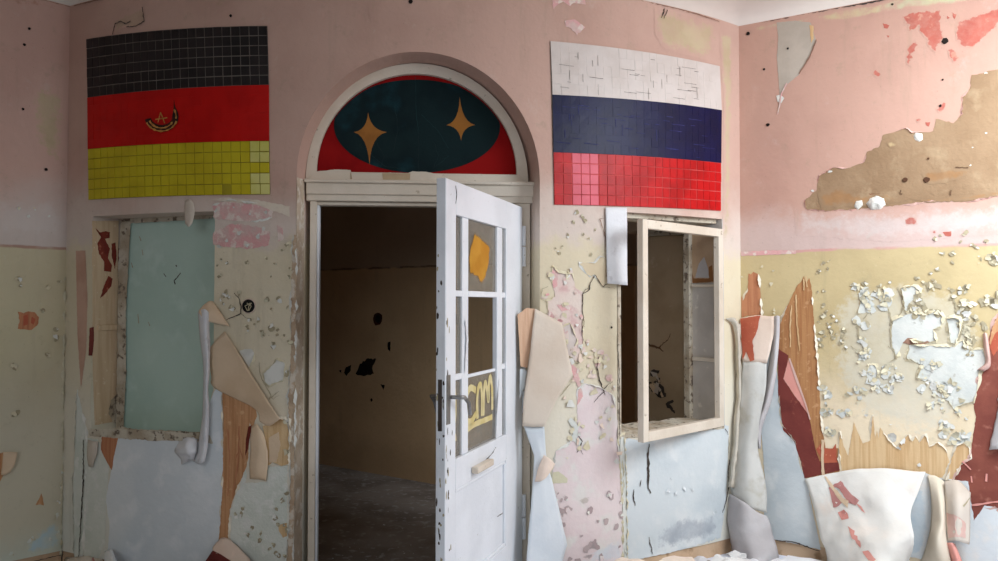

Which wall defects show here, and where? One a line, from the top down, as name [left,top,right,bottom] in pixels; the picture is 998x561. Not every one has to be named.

peeling [776,21,816,114]
spalling [804,69,998,212]
peeling [933,230,998,266]
flaking render [106,169,525,561]
crack [581,218,620,436]
peeling [817,267,998,447]
crack [633,444,651,503]
flaking render [761,350,821,550]
flaking render [911,463,998,561]